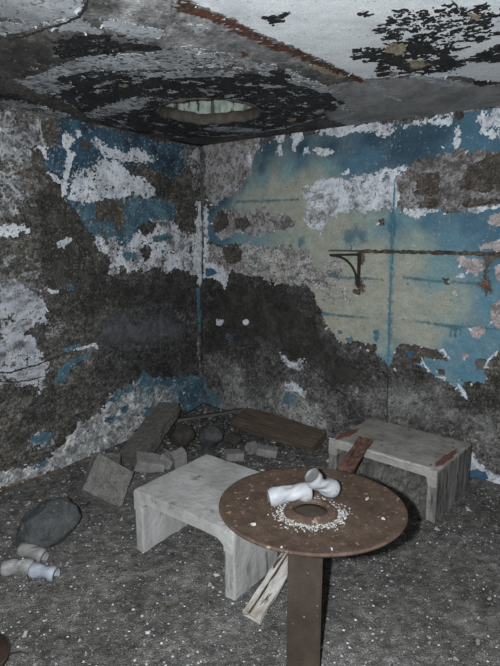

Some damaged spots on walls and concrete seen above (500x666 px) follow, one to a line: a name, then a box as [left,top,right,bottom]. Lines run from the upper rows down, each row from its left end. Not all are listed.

rust [171,0,364,83]
peeling [0,0,500,400]
rust [478,255,500,296]
water stain [94,287,204,383]
peeling [0,370,224,492]
water stain [216,363,328,433]